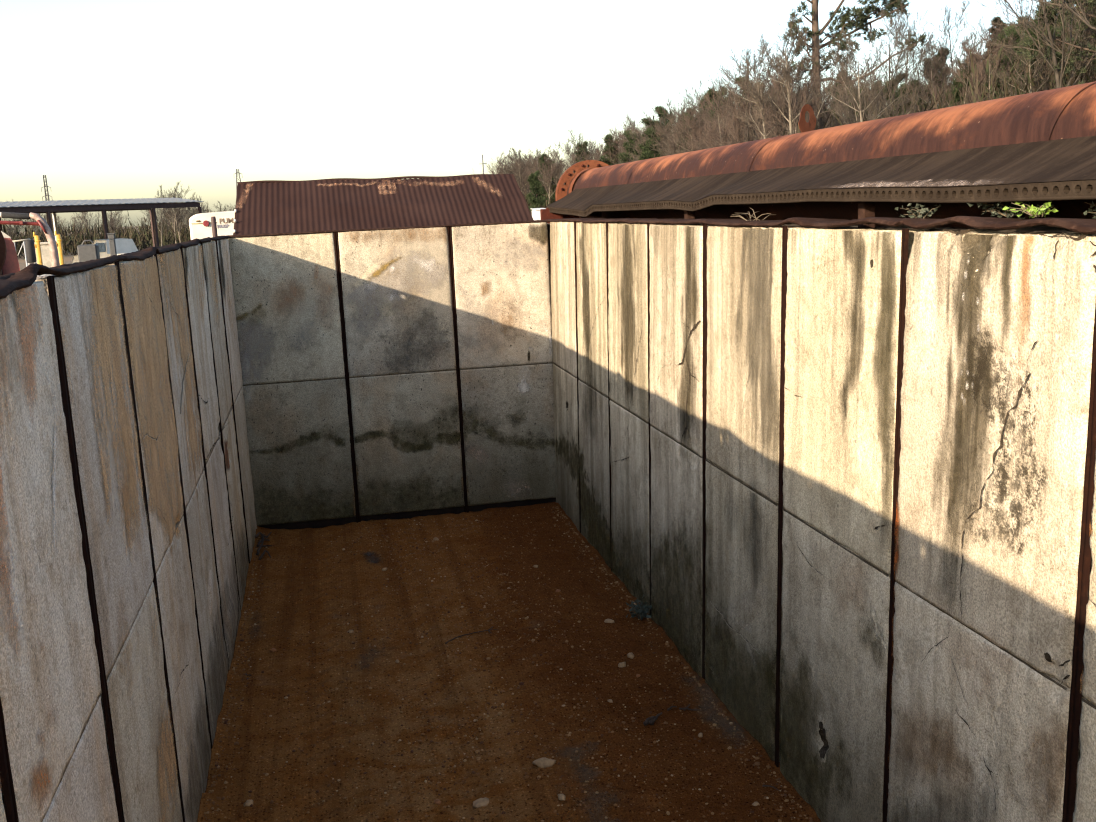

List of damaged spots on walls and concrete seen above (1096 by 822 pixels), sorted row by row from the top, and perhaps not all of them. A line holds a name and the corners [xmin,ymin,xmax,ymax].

corrosion [15,284,40,395]
corrosion [88,242,231,549]
damp [621,224,636,398]
crack [614,321,700,462]
damp [679,226,696,440]
damp [737,228,779,456]
damp [842,230,864,412]
damp [874,232,895,523]
damp [938,234,1044,554]
crack [922,340,1038,810]
spalling [817,715,829,766]